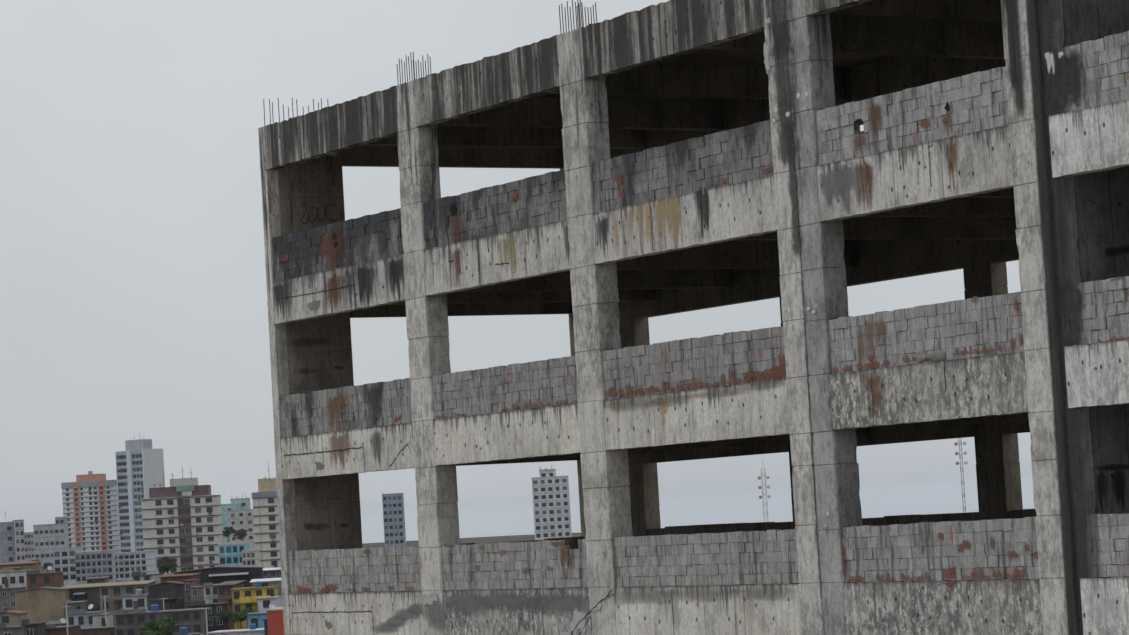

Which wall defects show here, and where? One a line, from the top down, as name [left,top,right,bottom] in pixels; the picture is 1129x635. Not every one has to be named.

water stain [767,0,808,254]
water stain [821,166,862,214]
rust [855,104,881,200]
rust [945,118,954,185]
rust [324,230,341,306]
water stain [1001,0,1129,635]
rust [330,393,348,465]
crack [571,589,614,635]